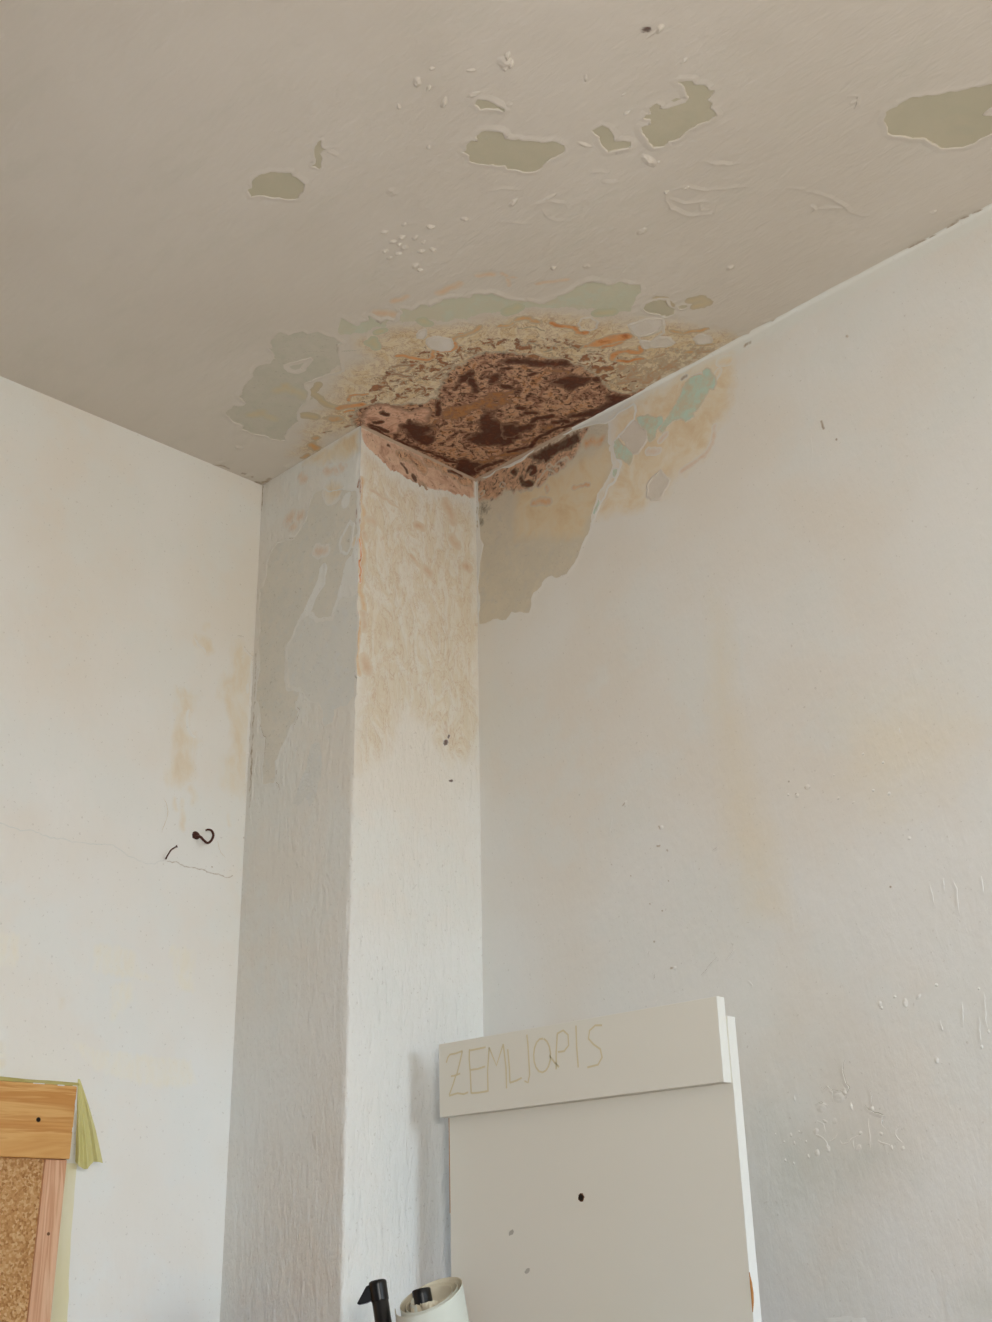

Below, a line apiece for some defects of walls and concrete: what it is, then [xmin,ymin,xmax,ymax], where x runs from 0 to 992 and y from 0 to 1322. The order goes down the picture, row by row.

peeling [241,137,341,204]
peeling [455,91,572,176]
peeling [587,74,723,157]
peeling [876,76,992,154]
damp [282,293,745,779]
peeling [476,367,717,628]